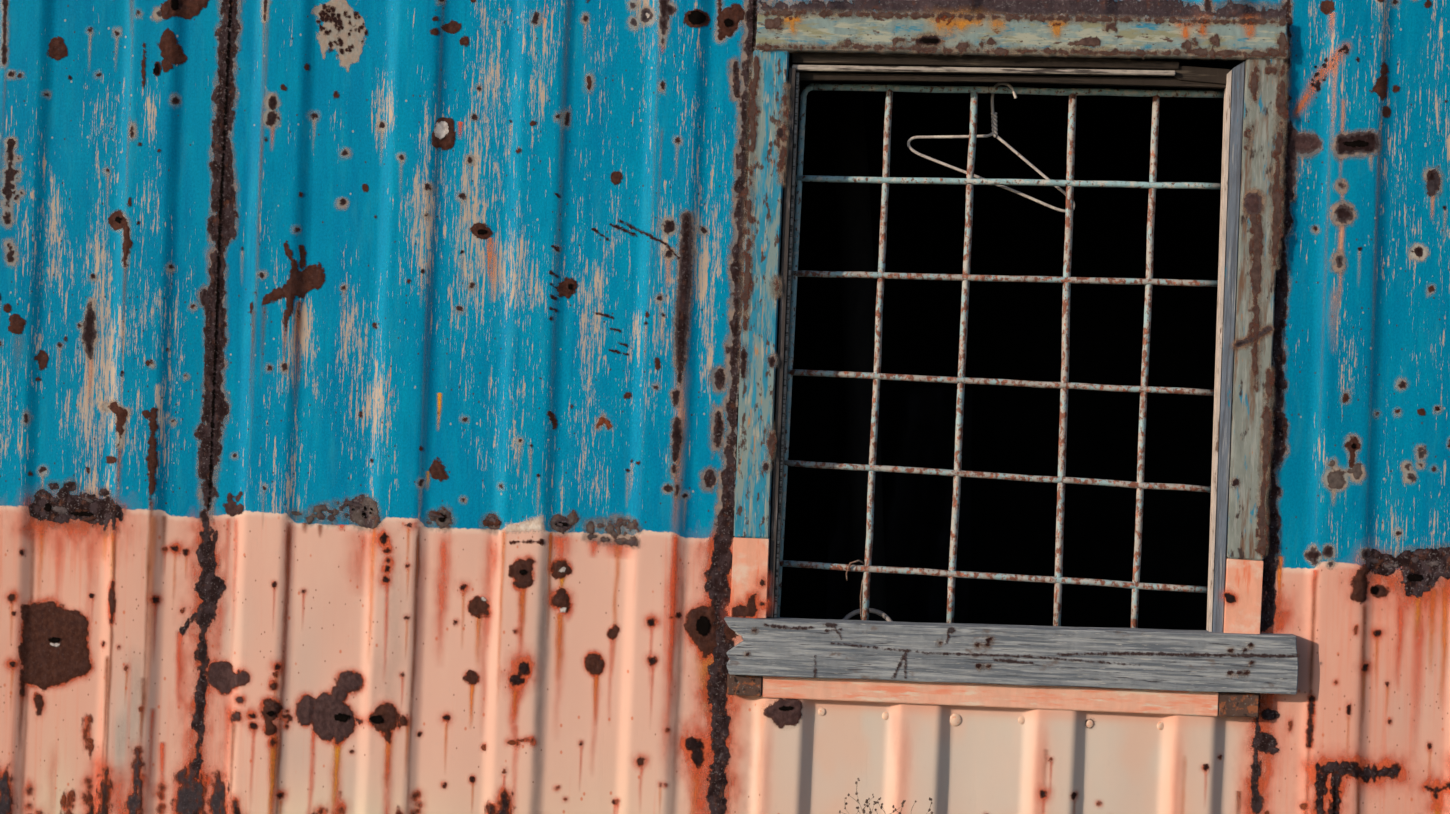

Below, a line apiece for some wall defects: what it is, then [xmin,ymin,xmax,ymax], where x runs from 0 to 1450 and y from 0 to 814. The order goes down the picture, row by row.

peeling [304,0,368,72]
corrosion [250,240,325,345]
corrosion [740,0,1400,633]
corrosion [103,400,165,528]
corrosion [223,491,244,516]
corrosion [1401,445,1426,484]
corrosion [0,517,422,814]
corrosion [764,698,802,728]
corrosion [1237,544,1407,814]
corrosion [1350,548,1450,683]
corrosion [484,769,513,814]
corrosion [1422,776,1450,814]